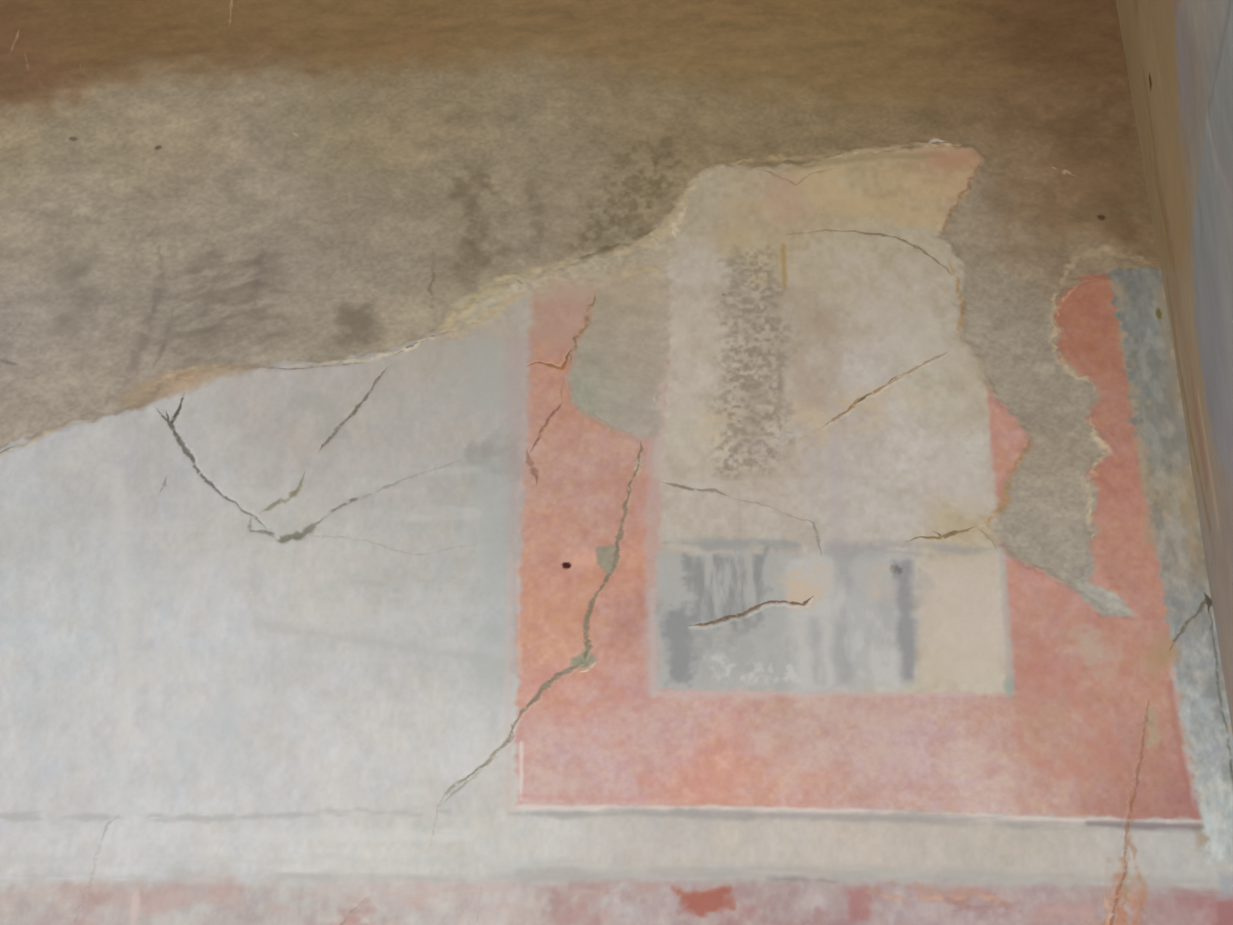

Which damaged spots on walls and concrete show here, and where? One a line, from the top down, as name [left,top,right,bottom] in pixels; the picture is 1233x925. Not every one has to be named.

crack [156,366,480,556]
crack [525,349,571,485]
flaking render [0,71,1160,622]
crack [905,526,996,548]
crack [429,440,821,851]
crack [1169,592,1233,788]
crack [1108,698,1150,925]